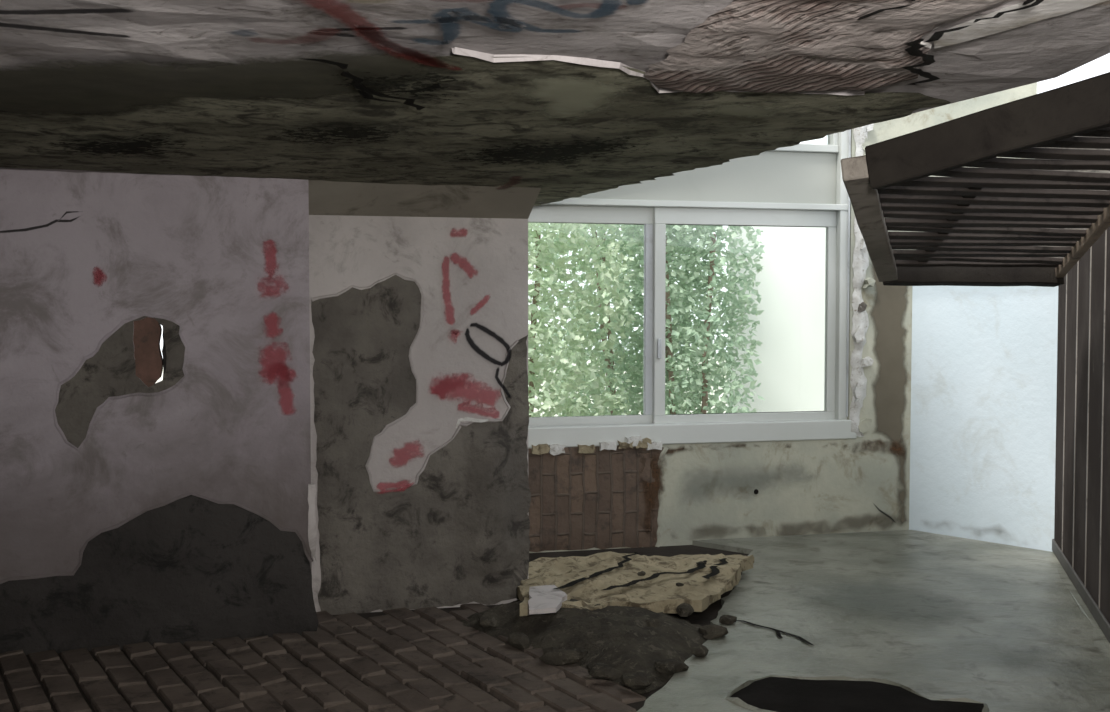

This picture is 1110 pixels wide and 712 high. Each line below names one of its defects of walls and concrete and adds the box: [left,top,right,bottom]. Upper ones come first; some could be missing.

crack [0,211,79,233]
water stain [50,134,185,158]
water stain [449,136,650,165]
peeling [0,0,1109,206]
flaking render [849,217,876,437]
flaking render [0,273,669,655]